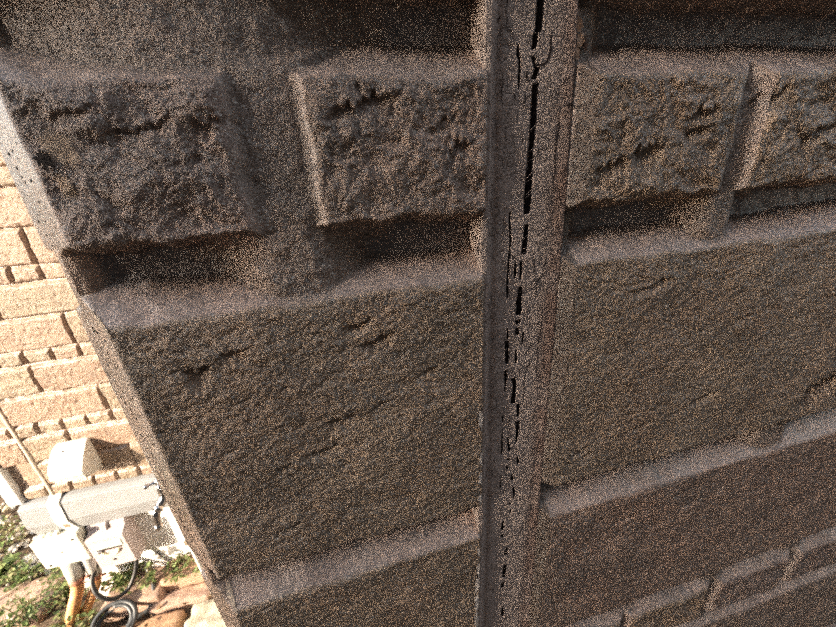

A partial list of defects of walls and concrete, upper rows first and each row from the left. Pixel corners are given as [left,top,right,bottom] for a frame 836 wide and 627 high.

crack [489,0,575,623]